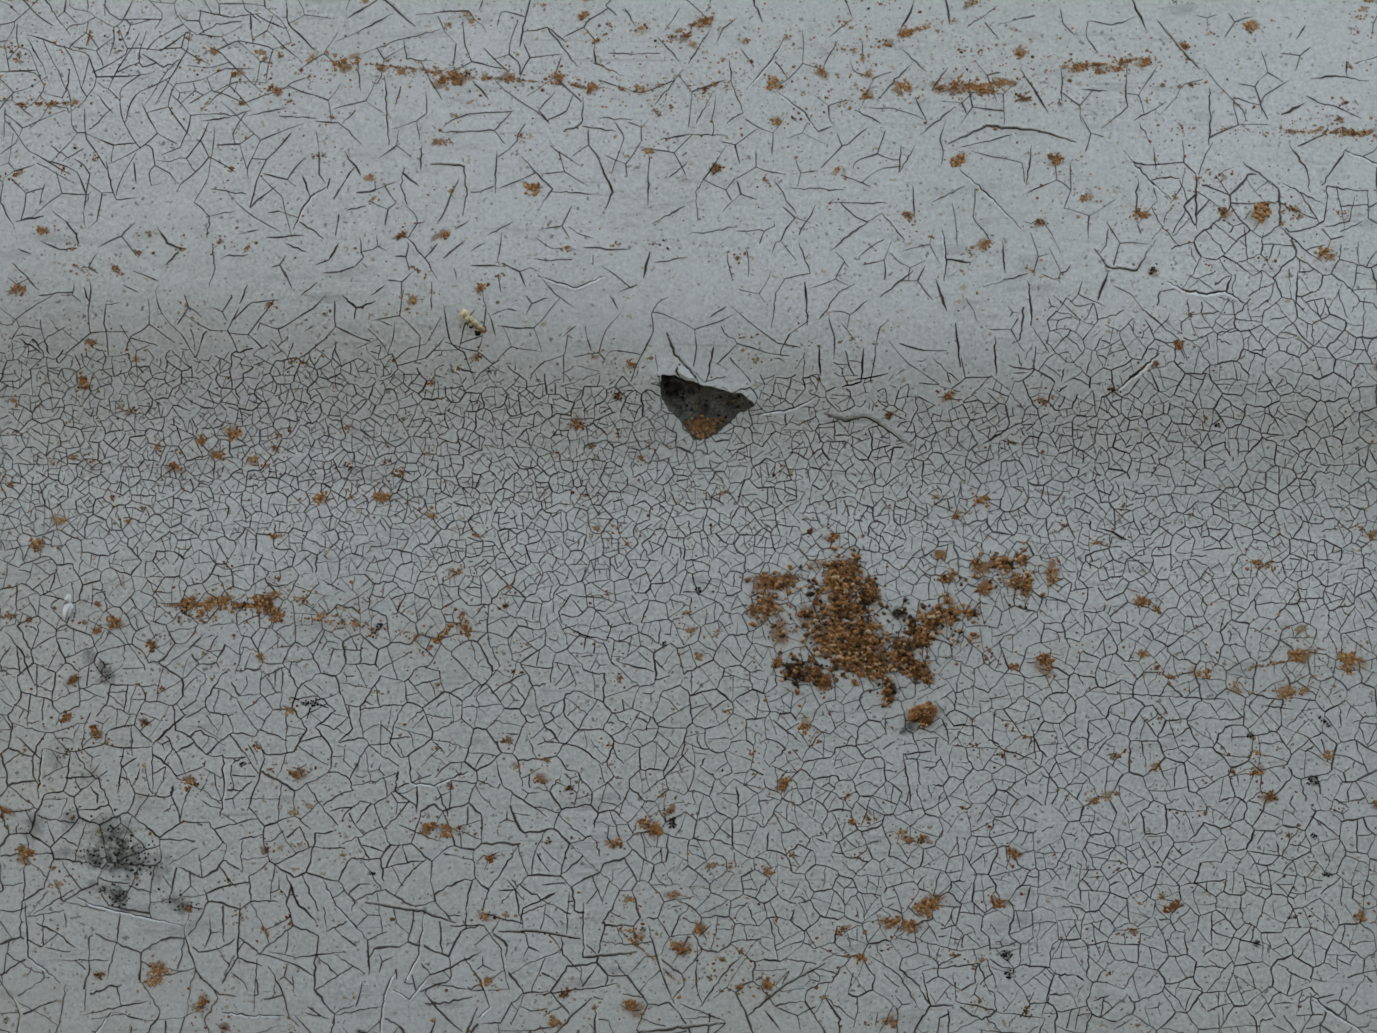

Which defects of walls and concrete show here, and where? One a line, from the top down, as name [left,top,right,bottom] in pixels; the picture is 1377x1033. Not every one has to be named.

crack [0,0,106,91]
crack [0,96,137,290]
rust [0,0,1377,358]
crack [142,0,1377,447]
peeling [660,366,755,441]
rust [0,411,529,741]
rust [574,510,1377,824]
crack [96,714,265,817]
crack [338,694,547,817]
rust [496,709,631,804]
rust [959,806,1064,921]
rust [1085,850,1203,944]